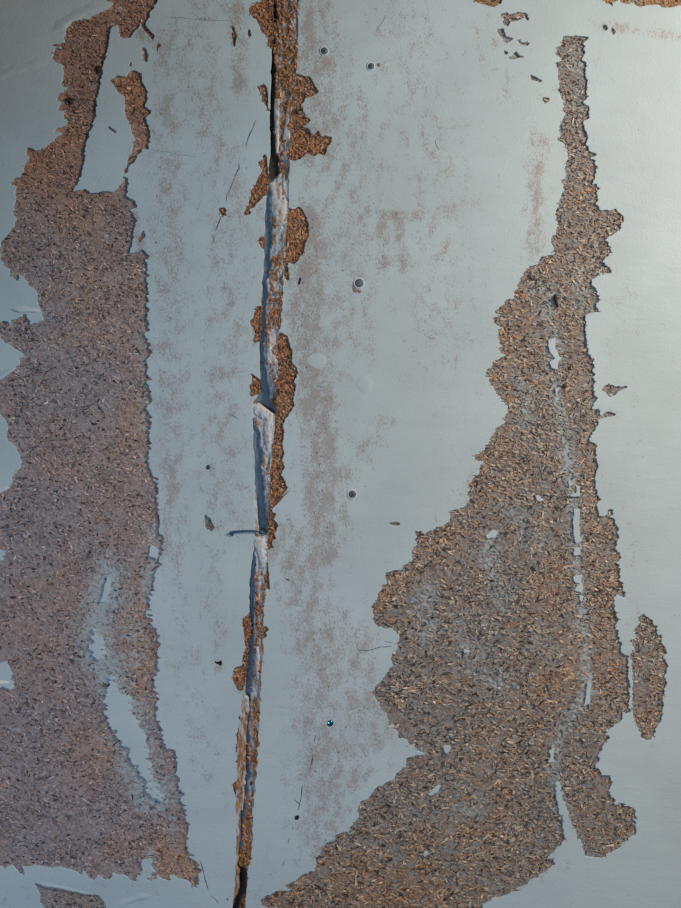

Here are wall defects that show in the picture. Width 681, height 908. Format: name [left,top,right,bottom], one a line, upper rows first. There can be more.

peeling [603,0,681,8]
spalling [257,83,270,111]
spalling [243,154,270,215]
spalling [250,306,263,343]
spalling [249,374,261,397]
peeling [0,0,201,888]
crack [201,0,299,908]
peeling [260,35,668,908]
peeling [35,883,106,908]